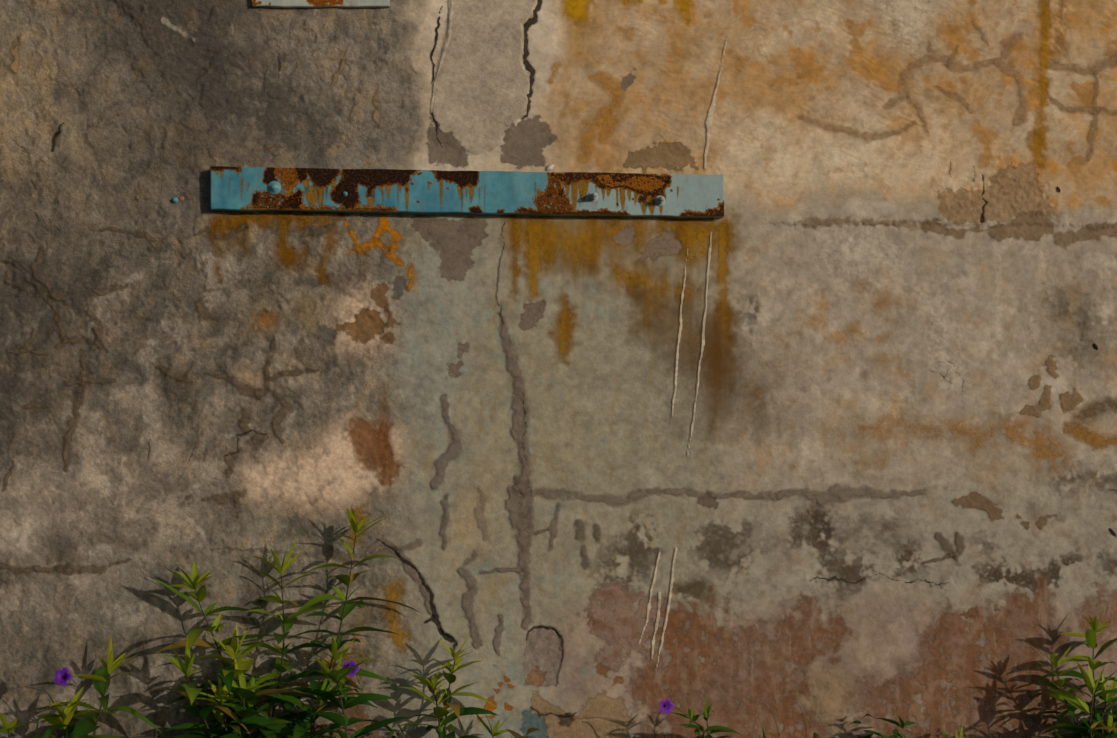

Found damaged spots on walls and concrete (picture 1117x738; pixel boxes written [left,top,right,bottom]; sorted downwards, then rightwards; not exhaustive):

crack [431,6,443,83]
crack [522,0,542,120]
rust [210,166,483,291]
rust [497,73,733,340]
rust [556,296,576,358]
damp [671,250,688,426]
damp [688,232,712,454]
crack [152,339,318,518]
crack [211,222,926,662]
damp [622,525,706,670]
peeling [521,583,852,738]
damp [980,555,1080,592]